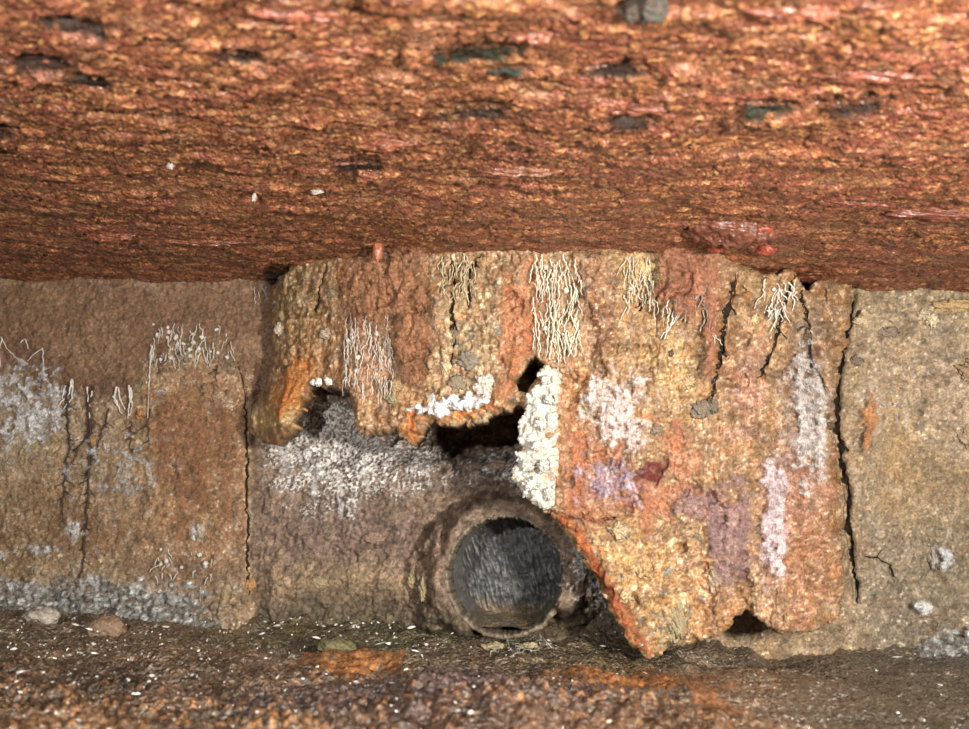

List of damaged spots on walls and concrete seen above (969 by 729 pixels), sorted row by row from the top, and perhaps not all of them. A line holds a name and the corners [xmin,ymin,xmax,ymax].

rust [246,7,343,26]
rust [506,31,561,47]
rust [738,4,842,25]
leakage [0,574,220,629]
leakage [0,277,272,456]
crack [237,366,250,594]
leakage [261,365,563,520]
spalling [250,387,623,647]
rust [445,256,560,421]
leakage [573,454,643,509]
leakage [579,366,651,453]
rust [550,413,749,655]